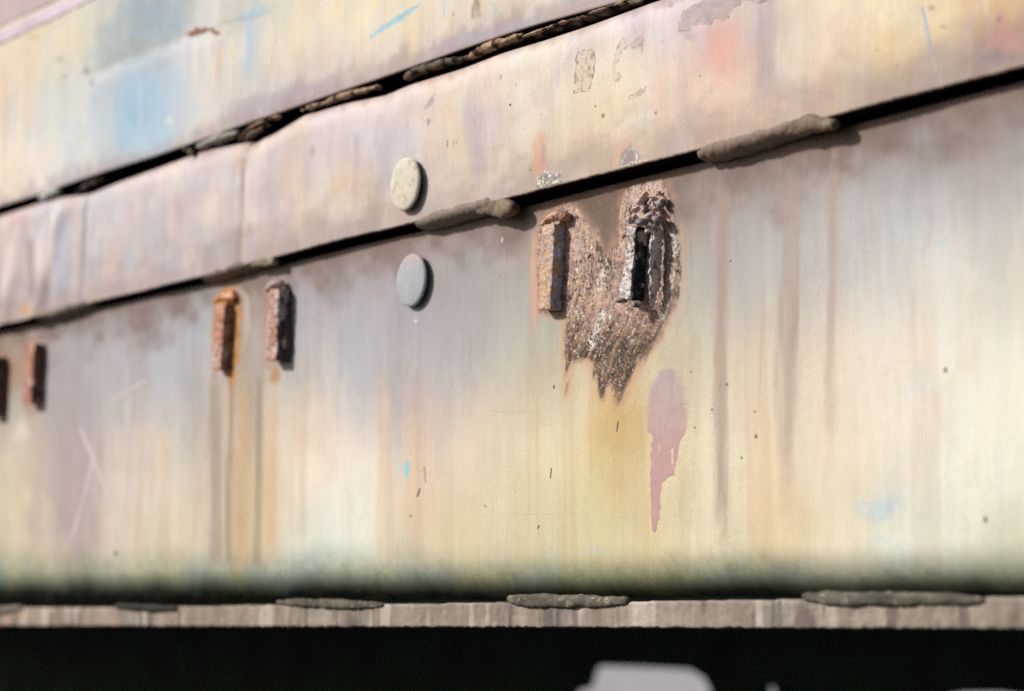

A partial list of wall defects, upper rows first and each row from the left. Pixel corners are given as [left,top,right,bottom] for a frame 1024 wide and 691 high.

peeling [573,48,596,94]
peeling [667,0,769,44]
rust [0,334,46,424]
rust [205,277,294,568]
rust [524,176,693,529]
leakage [756,155,807,534]
leakage [821,137,840,487]